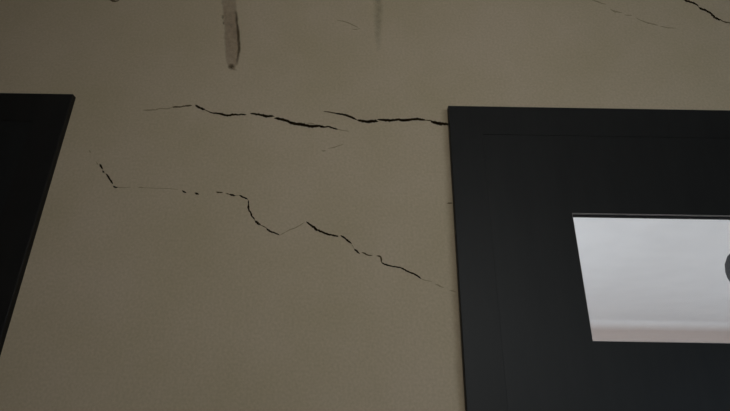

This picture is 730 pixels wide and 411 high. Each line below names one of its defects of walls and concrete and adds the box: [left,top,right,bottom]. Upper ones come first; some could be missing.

crack [684,0,730,23]
crack [144,105,448,151]
crack [89,150,199,195]
crack [217,191,456,292]